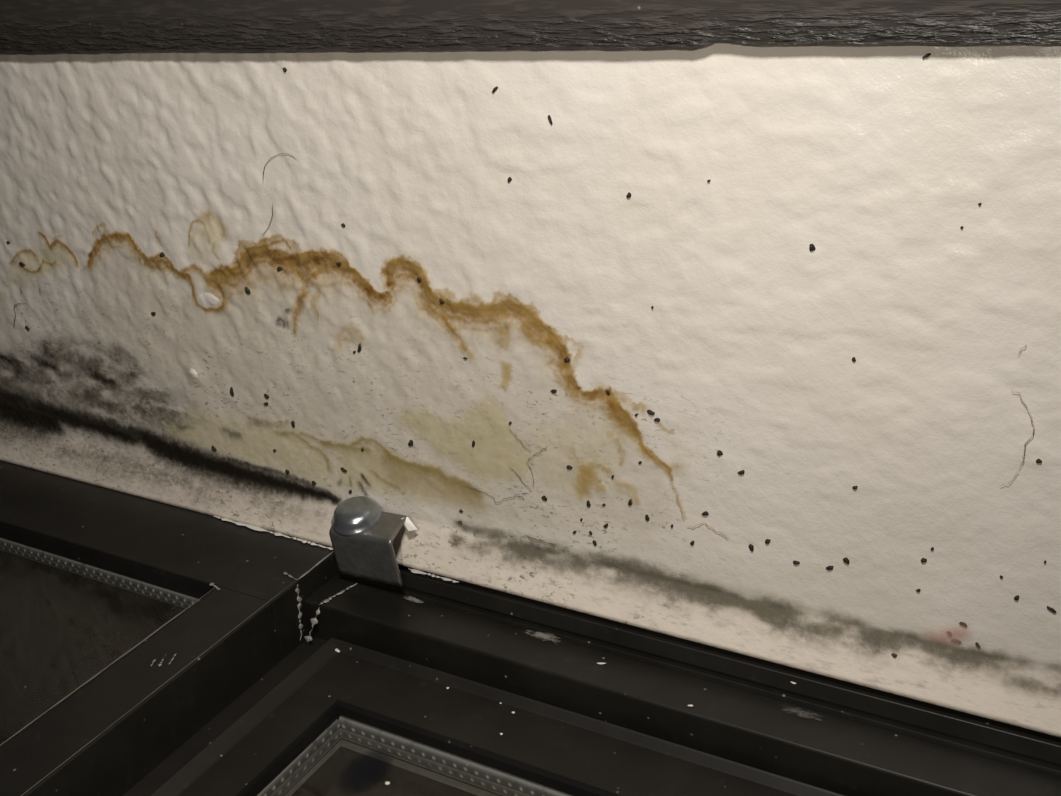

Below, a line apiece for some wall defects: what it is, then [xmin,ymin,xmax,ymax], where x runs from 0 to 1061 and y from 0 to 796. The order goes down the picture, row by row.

leakage [0,340,341,504]
leakage [11,232,672,480]
leakage [316,437,479,495]
crack [1000,390,1034,486]
leakage [453,521,1004,665]